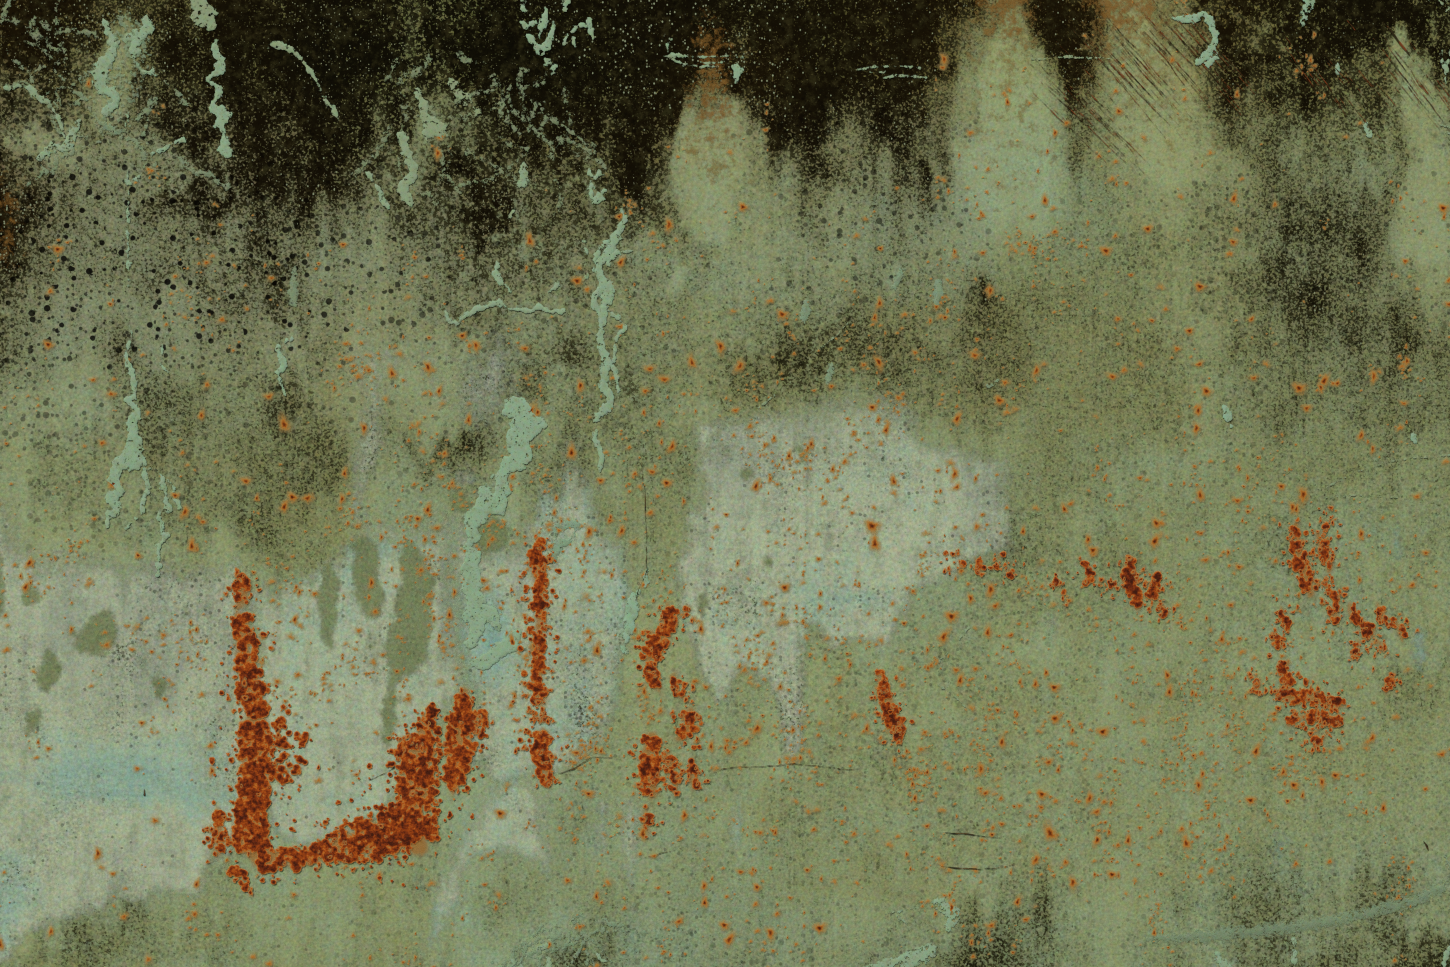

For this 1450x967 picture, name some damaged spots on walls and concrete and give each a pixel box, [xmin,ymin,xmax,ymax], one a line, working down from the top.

peeling [0,0,234,287]
peeling [104,325,182,577]
peeling [270,41,339,119]
peeling [355,54,607,210]
leakage [459,344,515,420]
peeling [459,396,548,670]
peeling [444,260,566,326]
peeling [581,208,633,472]
rust [94,295,1438,967]
rust [922,165,1016,220]